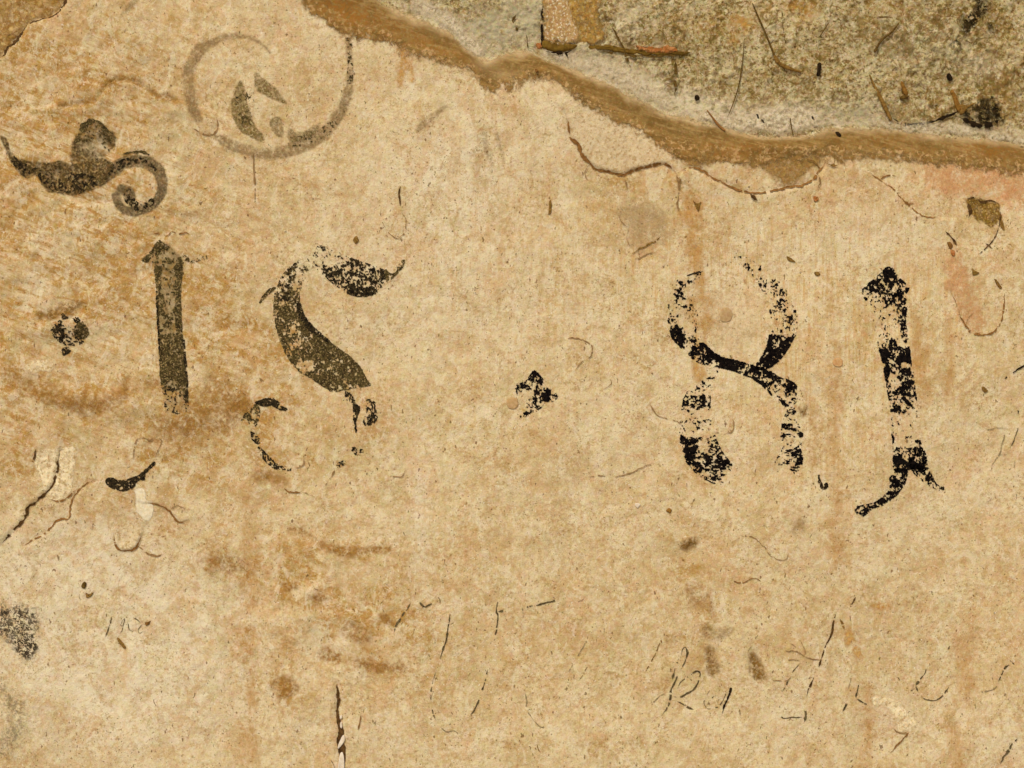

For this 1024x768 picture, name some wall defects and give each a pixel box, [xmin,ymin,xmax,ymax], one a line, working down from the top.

spalling [378,0,1024,147]
peeling [569,113,674,171]
crack [564,113,837,212]
crack [3,450,97,545]